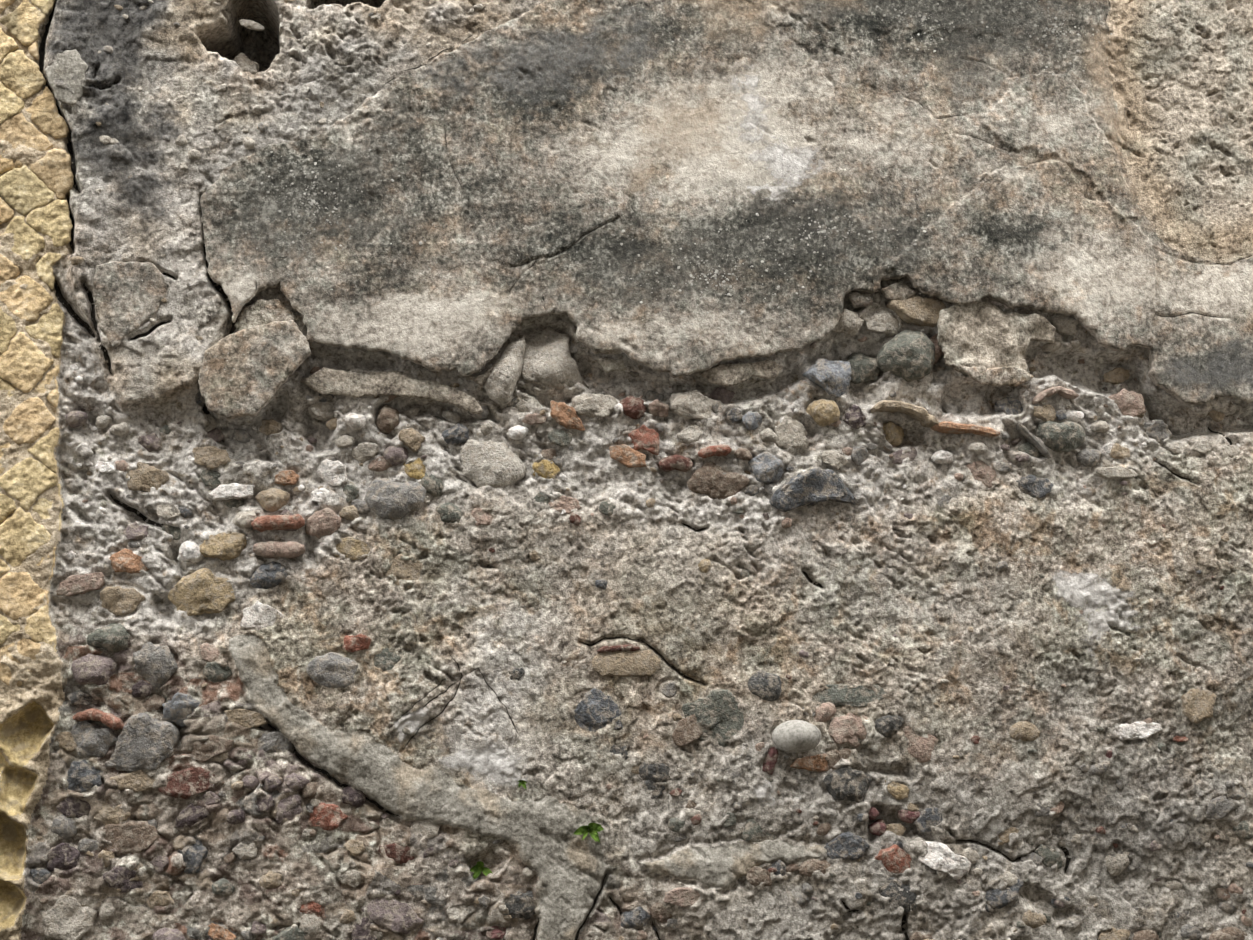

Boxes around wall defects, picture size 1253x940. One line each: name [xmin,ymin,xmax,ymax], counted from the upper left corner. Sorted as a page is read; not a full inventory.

crack [54,281,169,374]
crack [203,239,239,334]
crack [511,220,614,289]
spalling [187,252,1253,637]
peeling [162,506,192,540]
peeling [748,670,791,702]
peeling [1180,688,1216,724]
spalling [0,702,77,931]
peeling [606,745,709,842]
peeling [855,878,933,940]
peeling [936,847,1071,932]
peeling [998,823,1139,876]